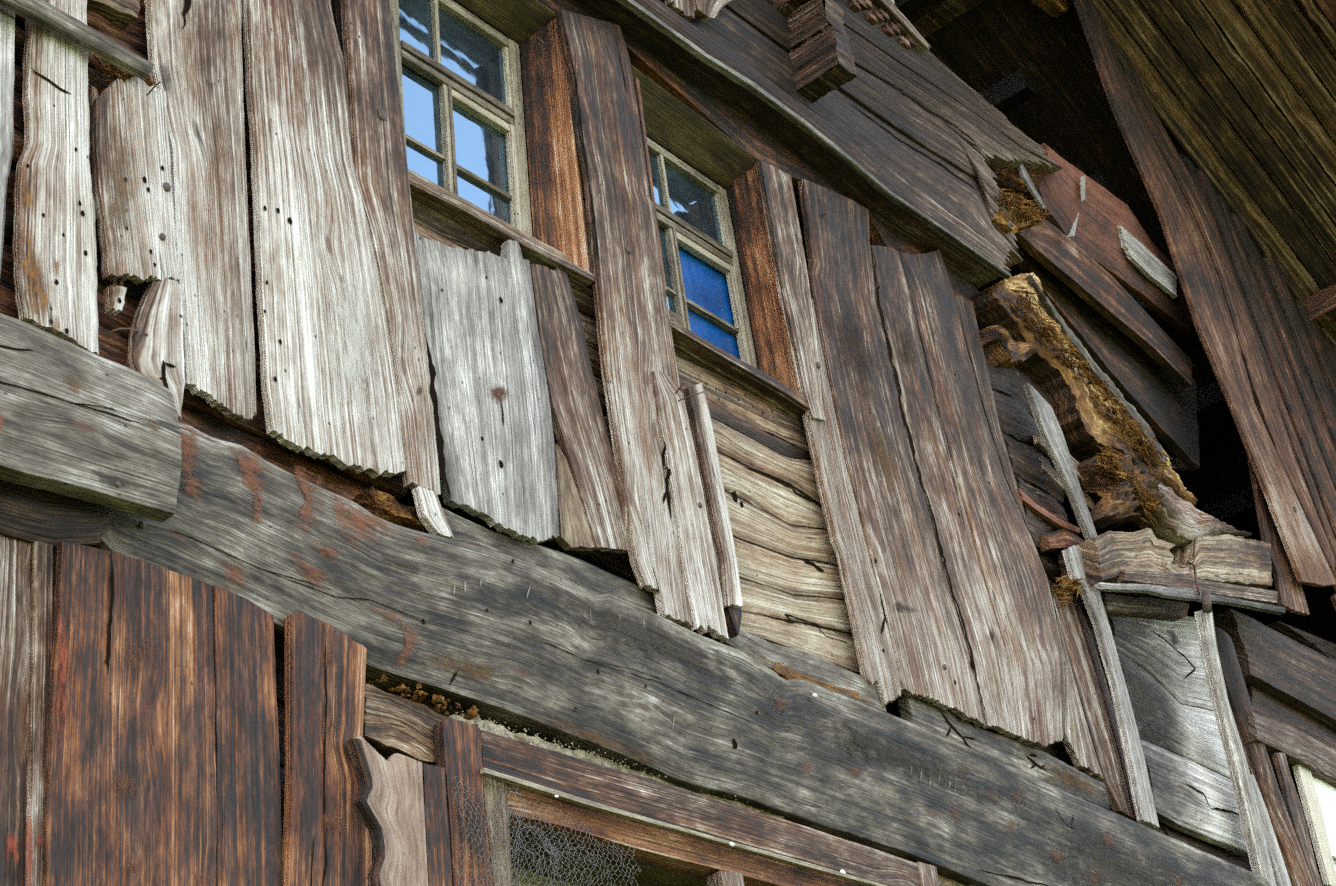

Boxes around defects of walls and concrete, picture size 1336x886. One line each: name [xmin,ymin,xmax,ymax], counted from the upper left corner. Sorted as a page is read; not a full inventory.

crack [182,0,191,29]
rust [180,429,202,500]
rust [231,447,264,521]
crack [661,441,672,518]
peeling [1169,456,1190,471]
crack [1152,630,1196,679]